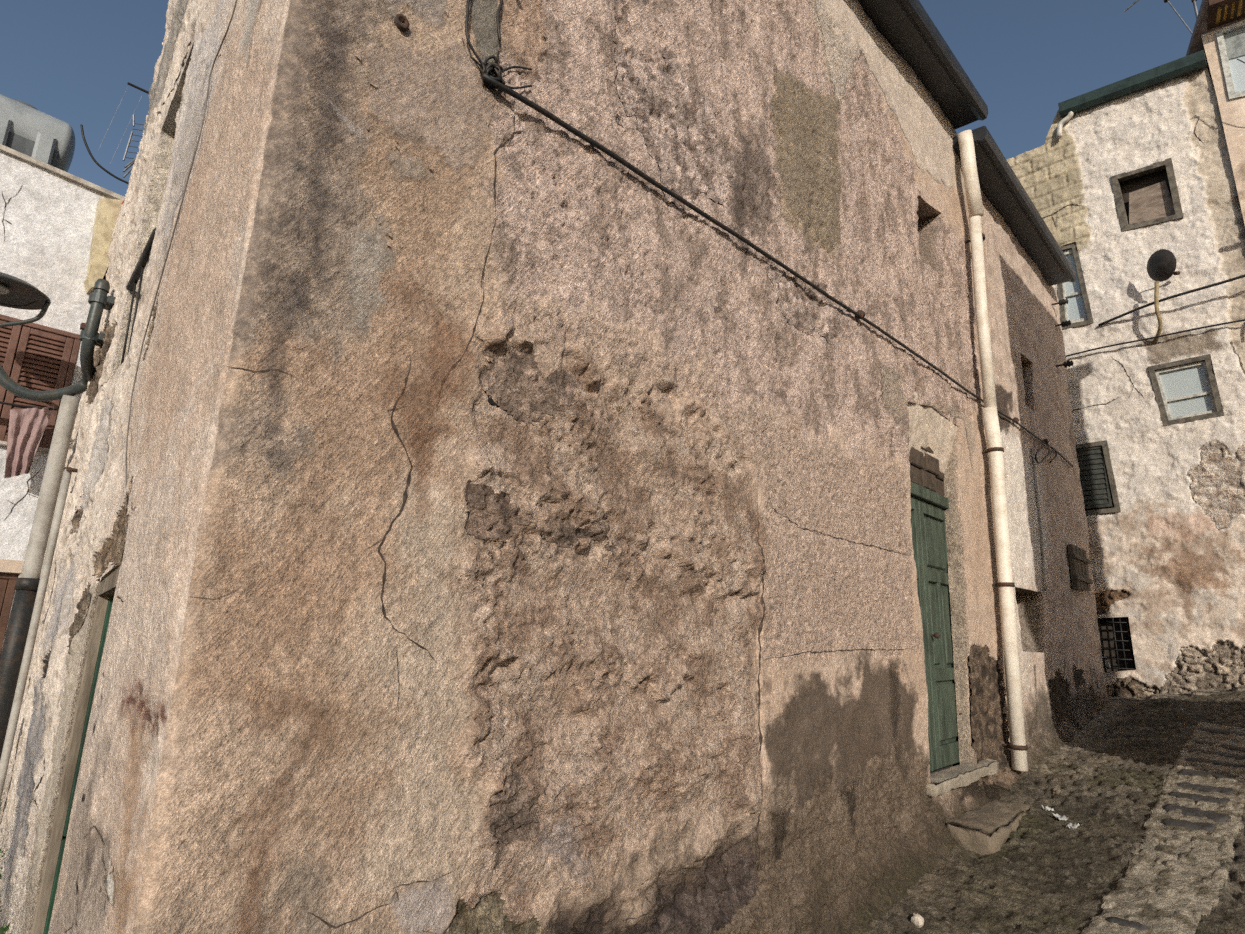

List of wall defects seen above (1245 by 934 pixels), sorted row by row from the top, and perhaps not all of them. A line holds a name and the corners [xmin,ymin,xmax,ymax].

crack [157,41,191,115]
crack [2,186,22,241]
crack [437,100,528,411]
crack [3,474,38,521]
spalling [67,476,133,654]
crack [364,358,435,711]
spalling [464,478,618,554]
spalling [1095,590,1129,614]
spalling [1187,440,1245,530]
spalling [1106,640,1245,698]
leakage [765,653,918,858]
spalling [967,643,1024,790]